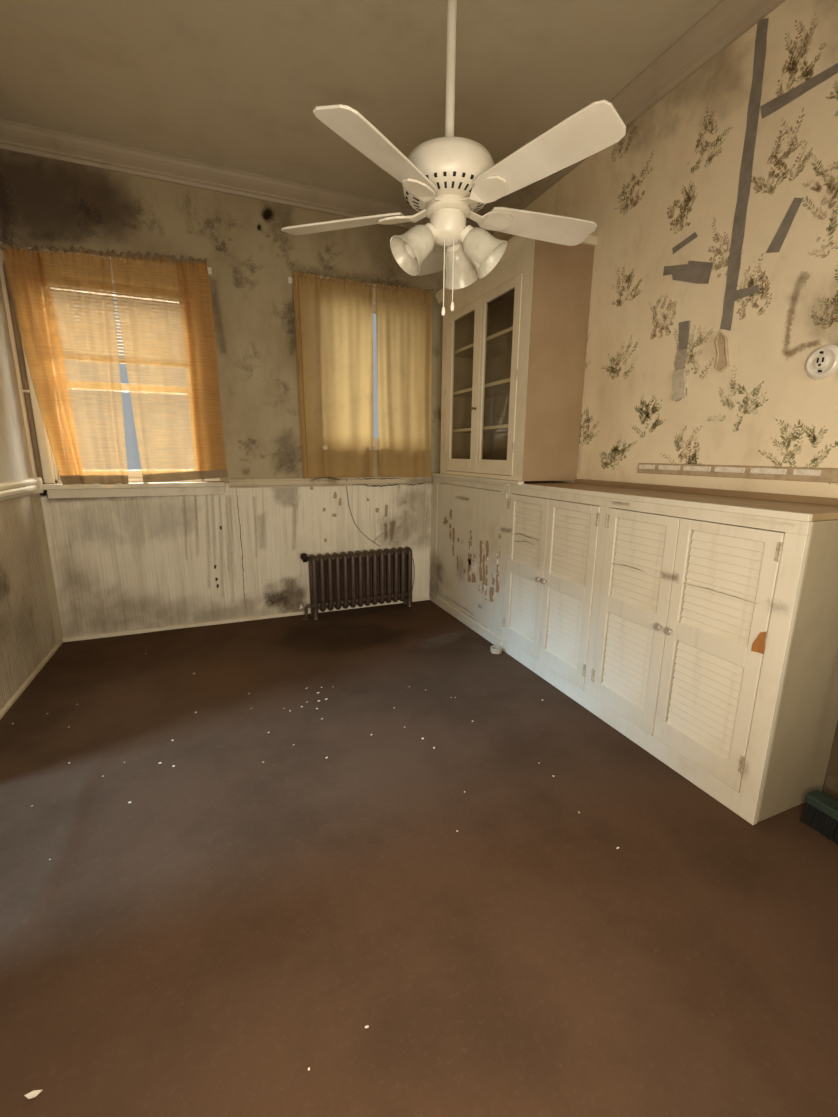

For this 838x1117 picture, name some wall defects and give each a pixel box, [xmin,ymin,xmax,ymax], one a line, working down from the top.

water stain [0,162,121,240]
peeling [443,510,501,602]